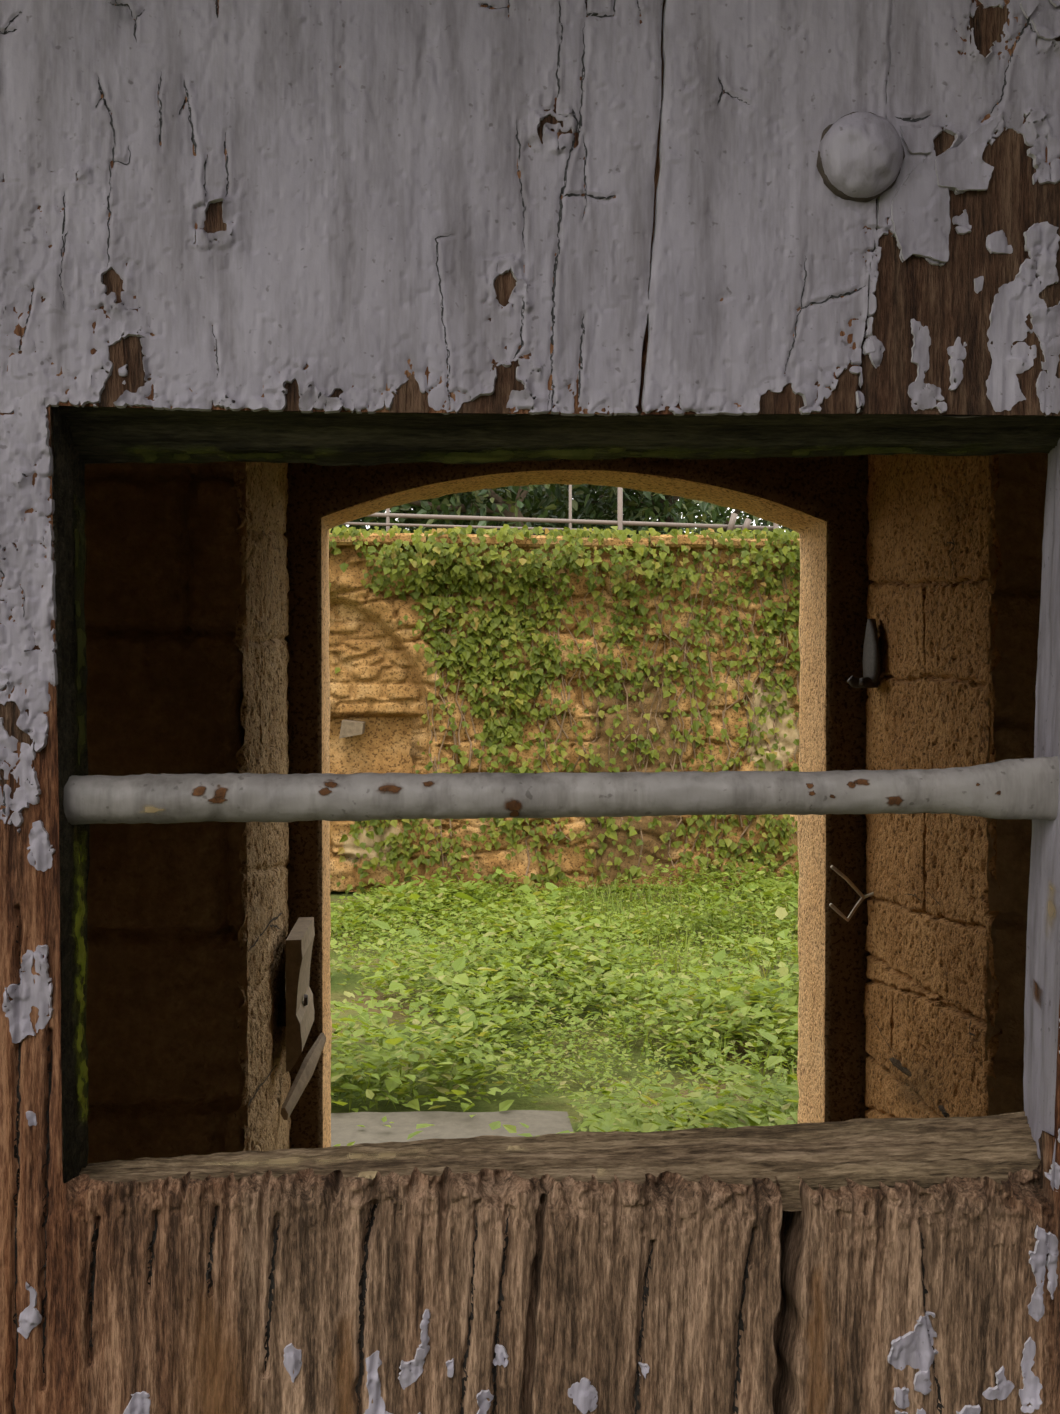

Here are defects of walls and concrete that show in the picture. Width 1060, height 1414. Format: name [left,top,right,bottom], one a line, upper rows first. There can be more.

peeling [967,4,1009,57]
peeling [758,112,1060,416]
peeling [494,270,517,306]
peeling [99,334,150,407]
peeling [389,374,430,413]
peeling [454,357,525,413]
corrosion [192,785,228,803]
corrosion [318,780,337,795]
corrosion [378,785,402,793]
corrosion [847,779,870,788]
corrosion [887,796,903,806]
peeling [0,685,1060,1414]